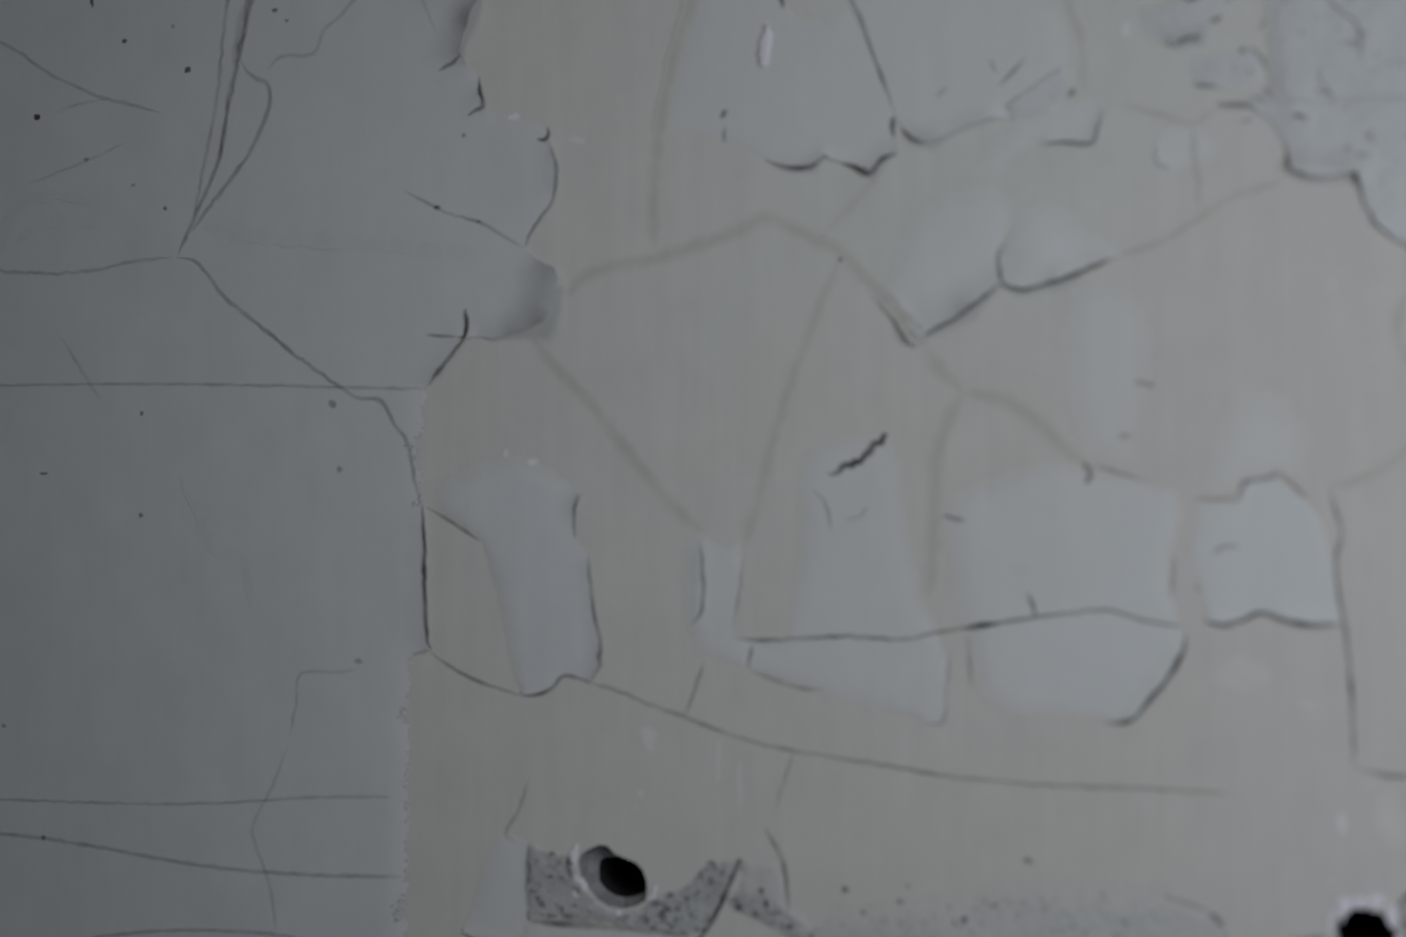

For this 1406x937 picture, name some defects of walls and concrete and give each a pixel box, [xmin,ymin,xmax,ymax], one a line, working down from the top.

peeling [665,0,1118,336]
peeling [1219,0,1406,243]
peeling [0,0,560,937]
crack [422,524,431,649]
peeling [749,431,949,723]
peeling [943,372,1340,724]
flaking render [463,831,1226,937]
flaking render [1292,893,1406,937]